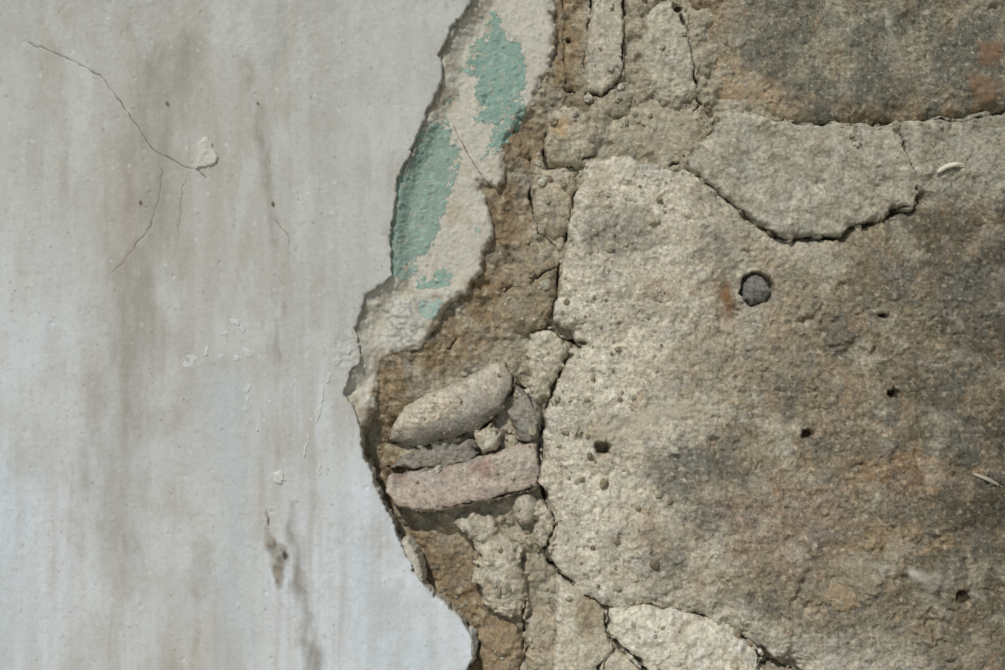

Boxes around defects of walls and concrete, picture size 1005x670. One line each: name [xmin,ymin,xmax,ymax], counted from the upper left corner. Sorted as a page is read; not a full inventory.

crack [670,19,918,241]
crack [932,111,1004,122]
flaking render [345,0,557,429]
flaking render [401,535,427,581]
spalling [823,558,886,613]
flaking render [468,625,479,663]